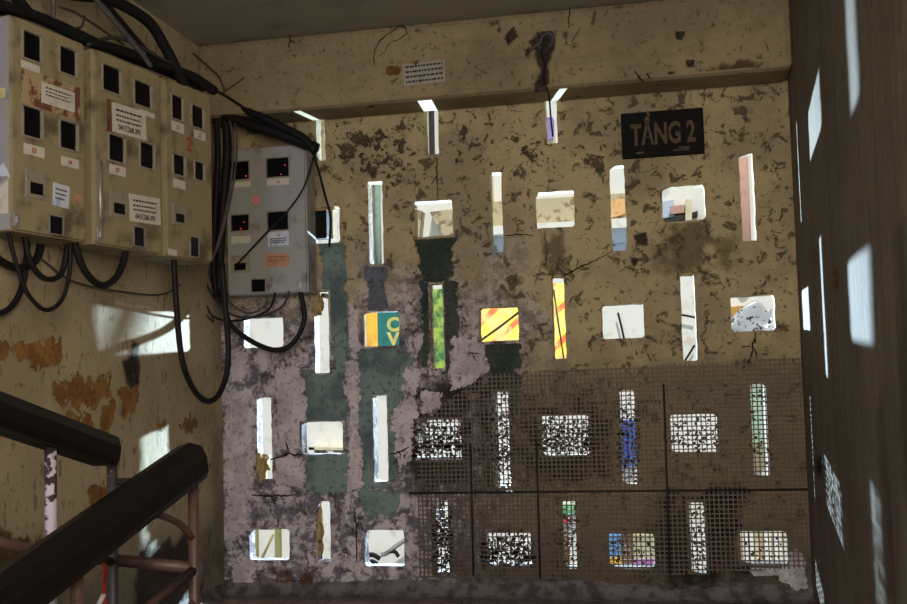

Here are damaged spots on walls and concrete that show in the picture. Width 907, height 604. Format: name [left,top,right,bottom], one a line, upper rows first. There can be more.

peeling [0,335,63,372]
peeling [52,342,141,434]
peeling [272,243,490,518]
flaking render [223,350,255,546]
flaking render [231,558,257,583]